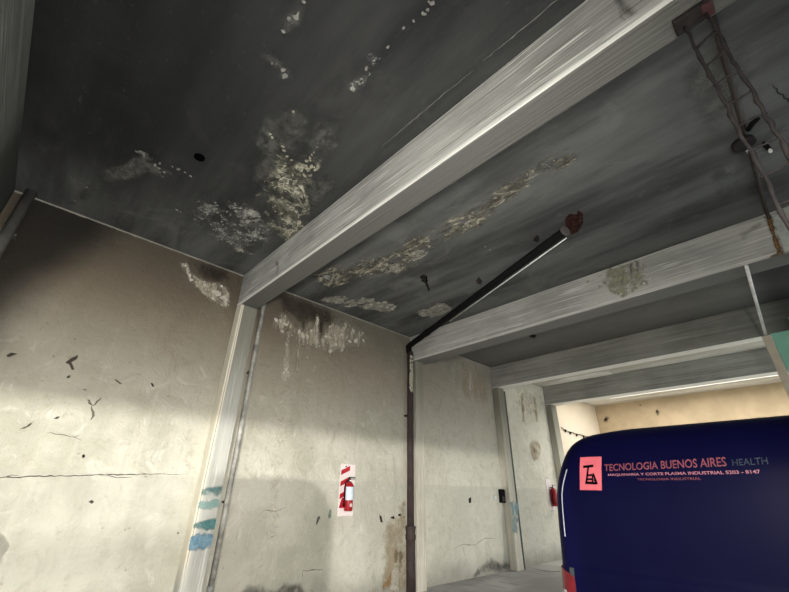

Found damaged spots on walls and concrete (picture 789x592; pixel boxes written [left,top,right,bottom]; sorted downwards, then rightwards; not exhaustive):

peeling [313,155,576,312]
spalling [565,210,583,235]
rust [765,217,784,258]
peeling [182,263,230,307]
water stain [599,262,651,297]
peeling [417,303,452,318]
crack [0,471,180,479]